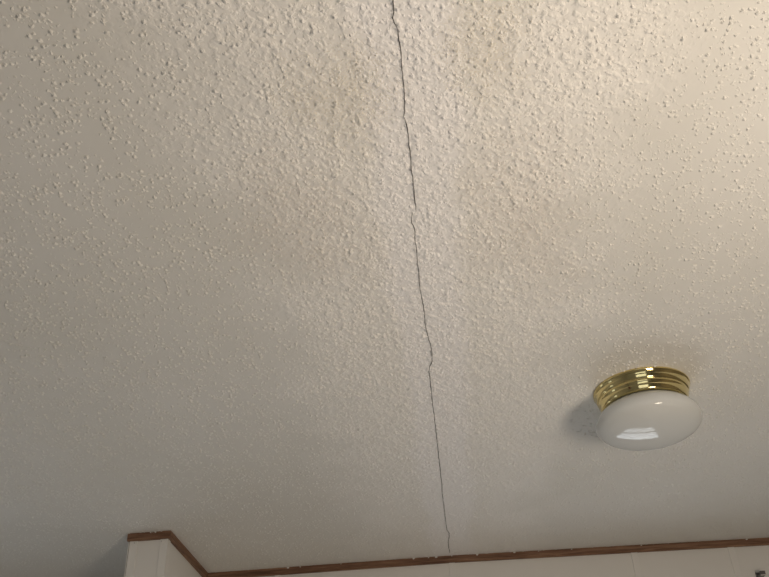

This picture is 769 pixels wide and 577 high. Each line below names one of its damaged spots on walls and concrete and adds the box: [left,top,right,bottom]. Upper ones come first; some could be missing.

crack [392,0,450,552]